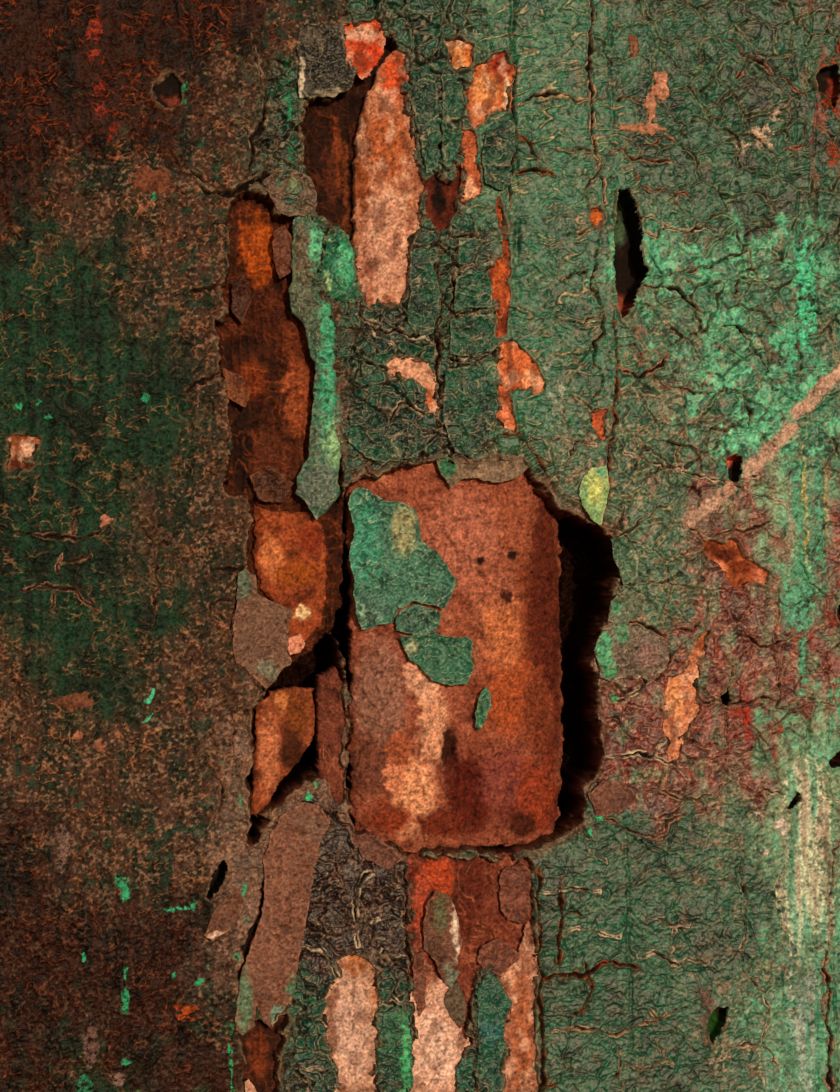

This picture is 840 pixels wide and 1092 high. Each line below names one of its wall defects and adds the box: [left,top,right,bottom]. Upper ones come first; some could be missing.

rust [86,20,104,64]
crack [355,232,499,451]
crack [489,0,840,540]
peeling [8,435,40,469]
spalling [230,20,564,1092]
peeling [579,466,610,526]
spalling [703,539,768,588]
crack [603,614,833,839]
rust [732,700,753,748]
rust [174,1005,197,1021]
crack [535,868,707,1092]
crack [811,840,840,1092]